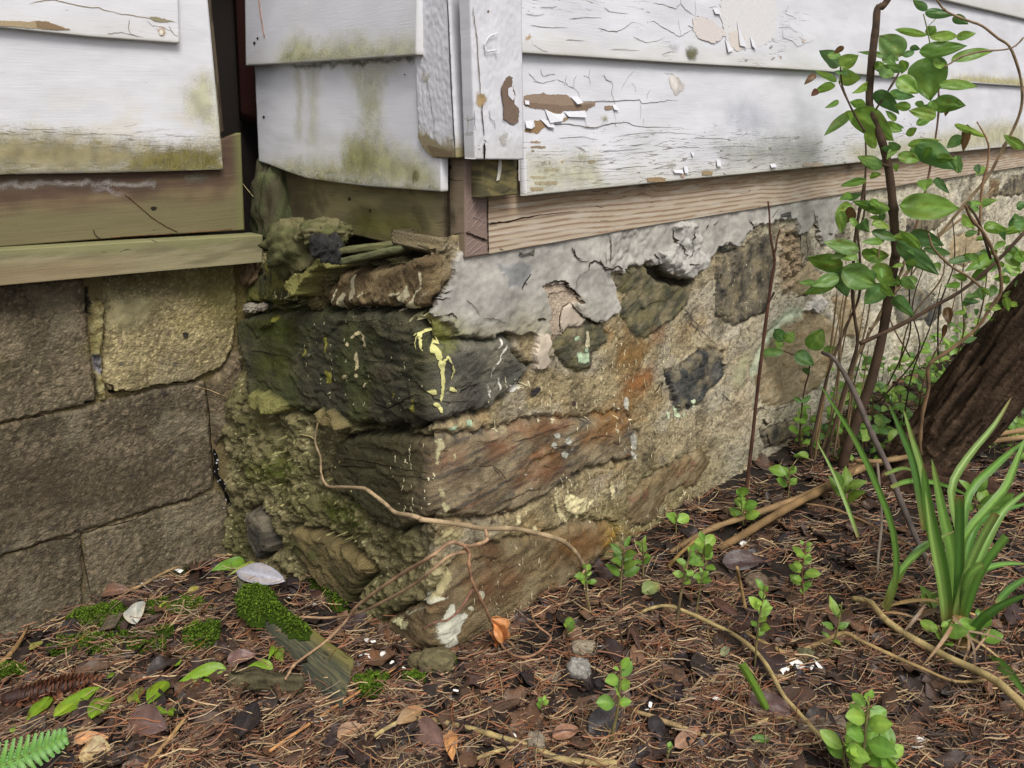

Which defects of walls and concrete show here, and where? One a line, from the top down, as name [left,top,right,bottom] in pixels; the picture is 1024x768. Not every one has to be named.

peeling [501,76,620,152]
crack [528,1,789,175]
water stain [299,138,431,188]
peeling [531,160,564,192]
spalling [643,264,692,287]
spalling [542,282,593,337]
crack [377,383,480,409]
crack [0,351,294,601]